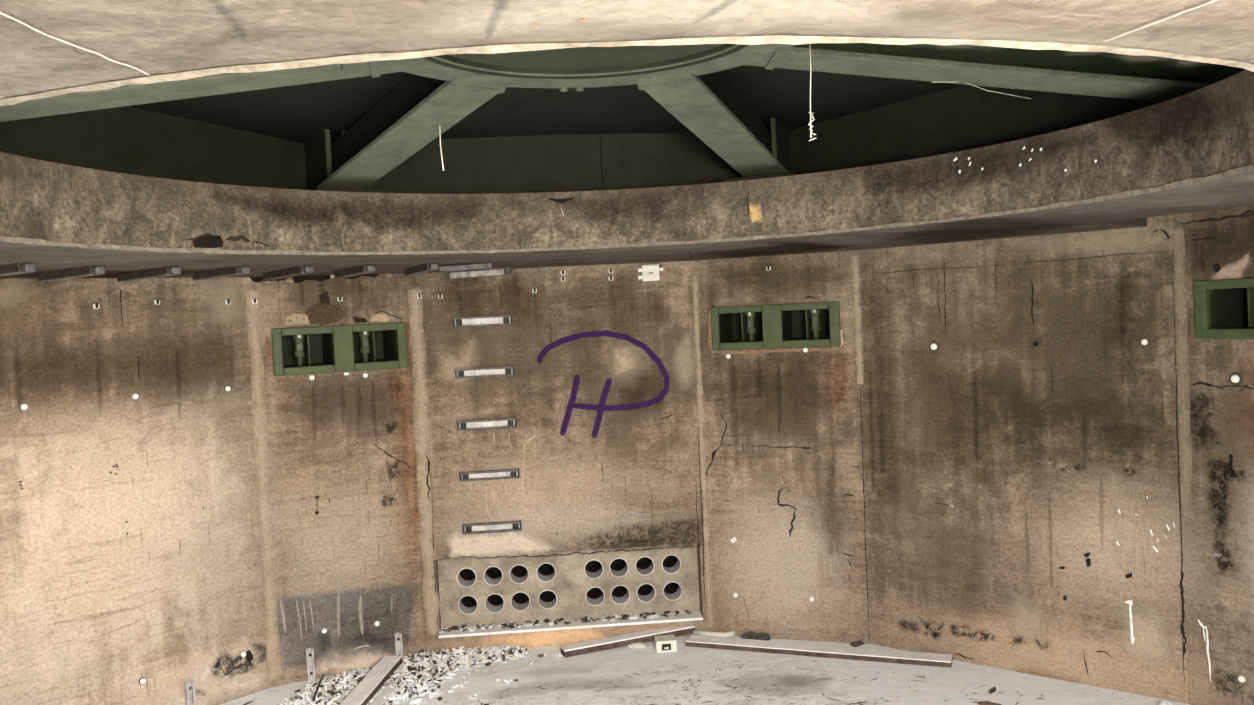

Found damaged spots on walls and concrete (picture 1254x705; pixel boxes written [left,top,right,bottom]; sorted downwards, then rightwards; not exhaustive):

spalling [185,233,273,248]
water stain [280,601,314,639]
water stain [321,596,382,671]
crack [372,412,820,624]
crack [842,390,870,642]
crack [876,210,1254,684]